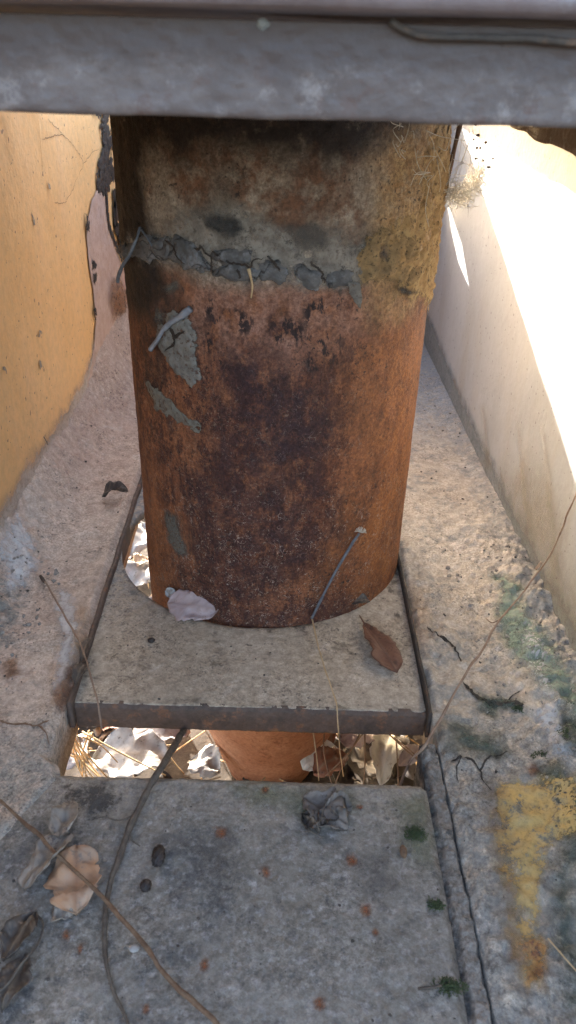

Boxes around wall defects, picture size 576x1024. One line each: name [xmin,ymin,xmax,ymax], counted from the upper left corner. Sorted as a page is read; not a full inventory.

peeling [86,189,126,388]
rust [111,280,127,315]
leakage [424,316,576,651]
leakage [522,621,570,754]
crack [452,751,508,790]